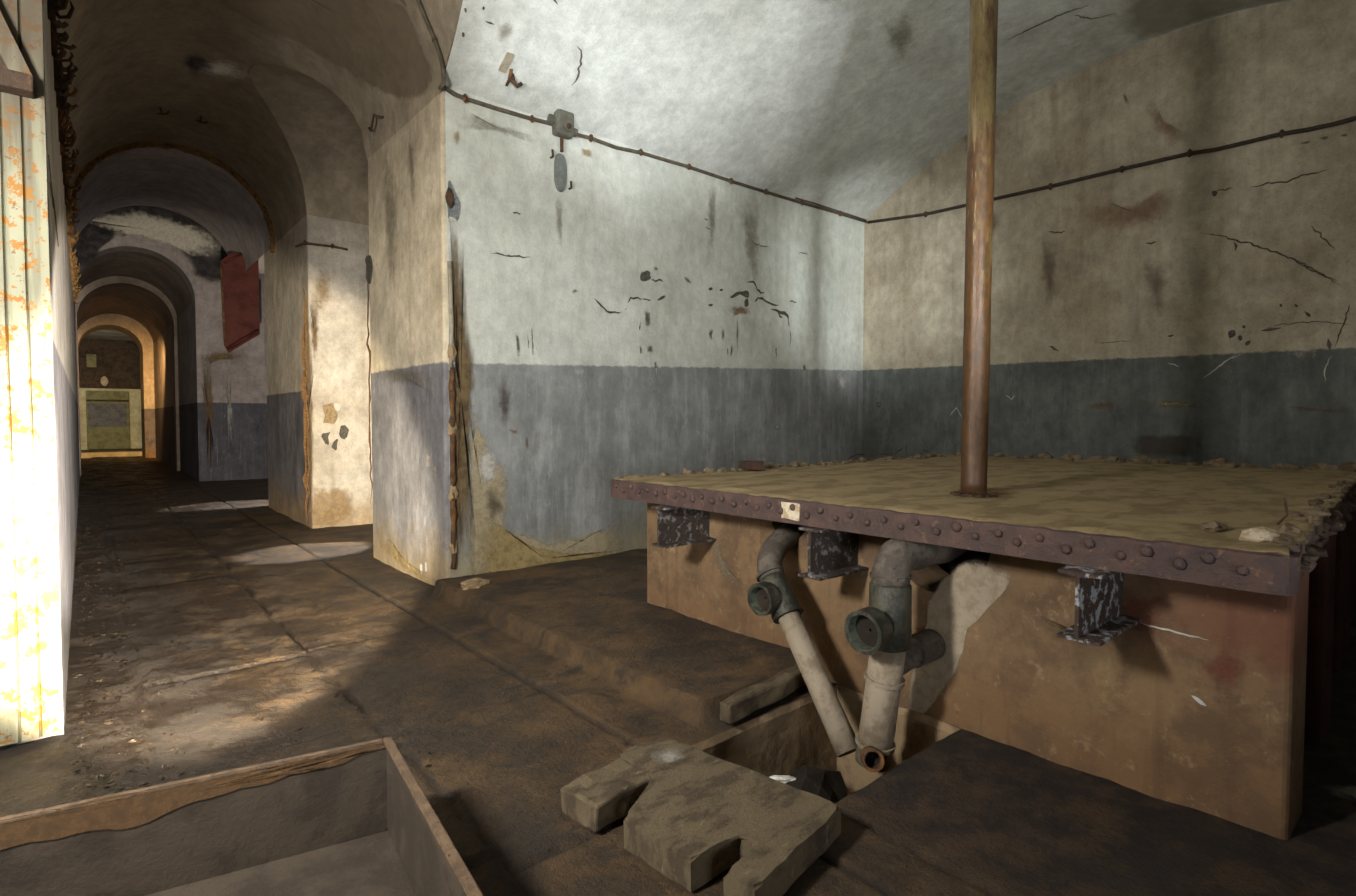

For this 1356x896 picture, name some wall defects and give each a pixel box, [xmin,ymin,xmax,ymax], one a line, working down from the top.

crack [1008,5,1116,40]
spalling [447,180,460,224]
crack [1216,170,1326,191]
spalling [640,270,652,281]
spalling [708,287,749,307]
crack [1204,226,1351,351]
spalling [321,403,349,450]
peeling [469,425,619,575]